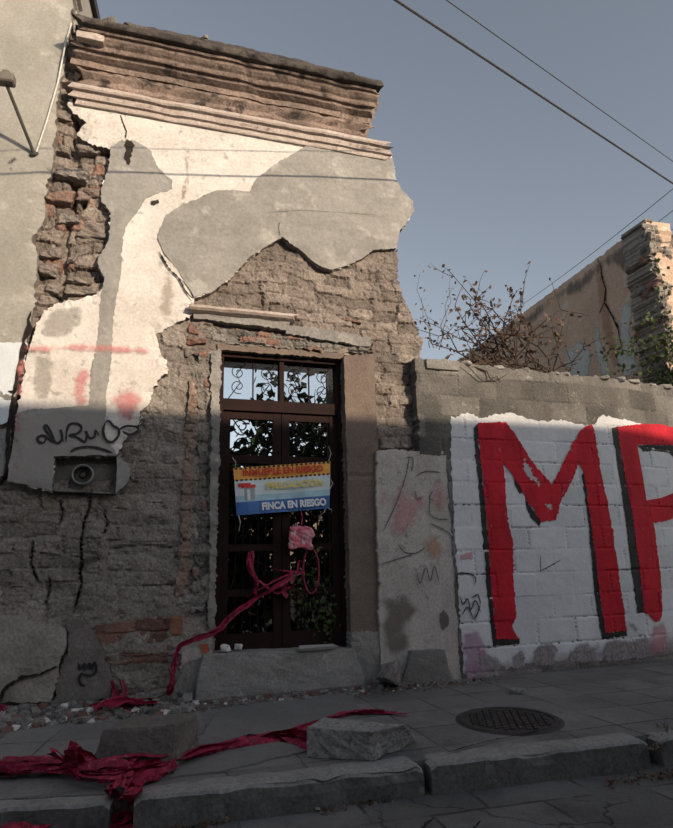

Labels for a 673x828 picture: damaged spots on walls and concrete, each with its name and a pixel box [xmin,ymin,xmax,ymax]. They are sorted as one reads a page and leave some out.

spalling [30,32,110,341]
crack [597,258,622,346]
crack [75,497,108,606]
spalling [0,240,423,707]